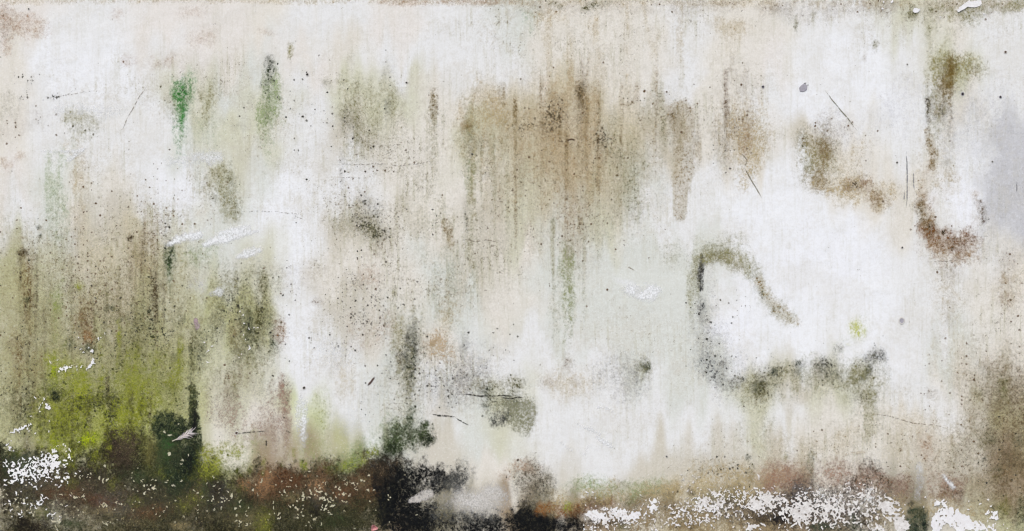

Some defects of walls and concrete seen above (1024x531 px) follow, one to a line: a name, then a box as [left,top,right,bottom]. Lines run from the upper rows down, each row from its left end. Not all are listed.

damp [172,79,214,137]
damp [925,51,976,117]
damp [333,160,407,245]
damp [463,67,698,320]
damp [800,118,836,193]
damp [0,190,220,485]
damp [308,249,536,440]
damp [685,247,849,407]
damp [336,447,584,531]
damp [715,465,906,531]